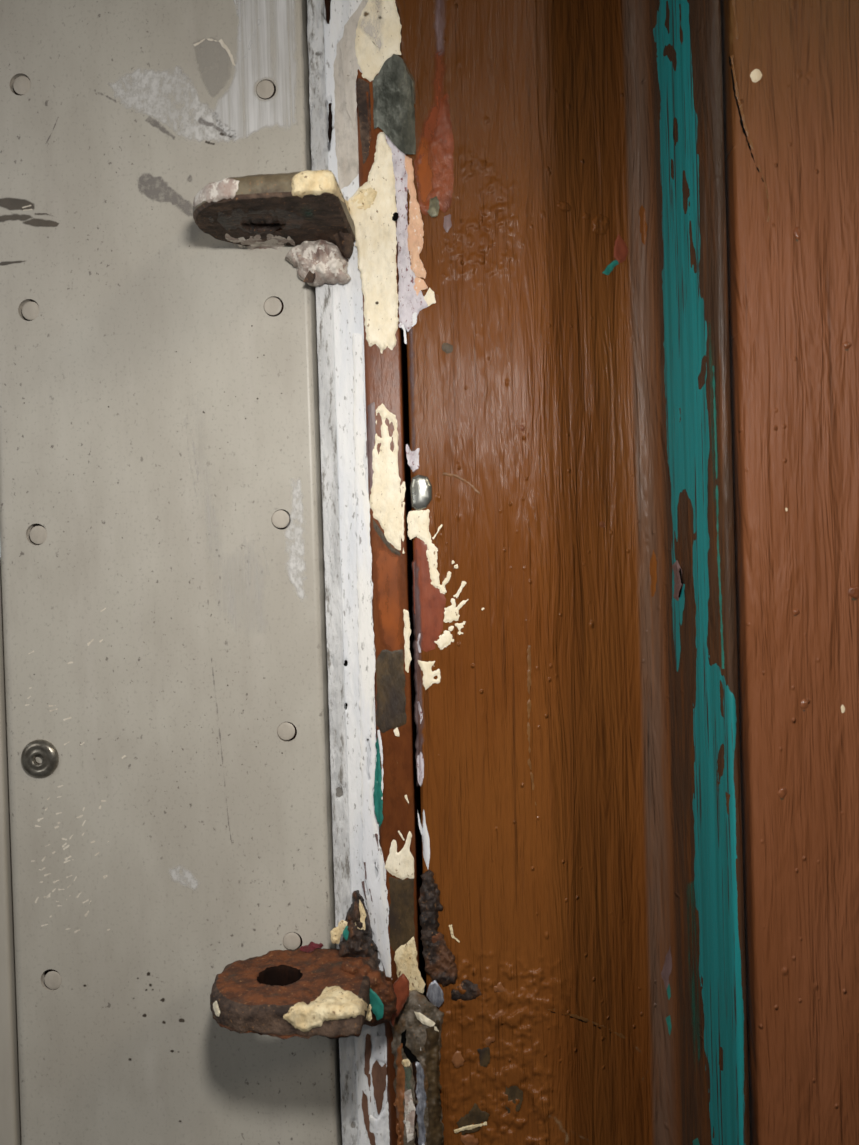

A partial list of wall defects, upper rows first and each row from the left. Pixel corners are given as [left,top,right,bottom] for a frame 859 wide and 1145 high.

peeling [292,0,416,213]
peeling [400,277,436,344]
peeling [412,537,446,652]
peeling [376,649,407,733]
peeling [330,899,366,944]
peeling [389,877,415,951]
peeling [427,980,444,1008]
peeling [283,986,390,1145]
spalling [401,1030,420,1063]